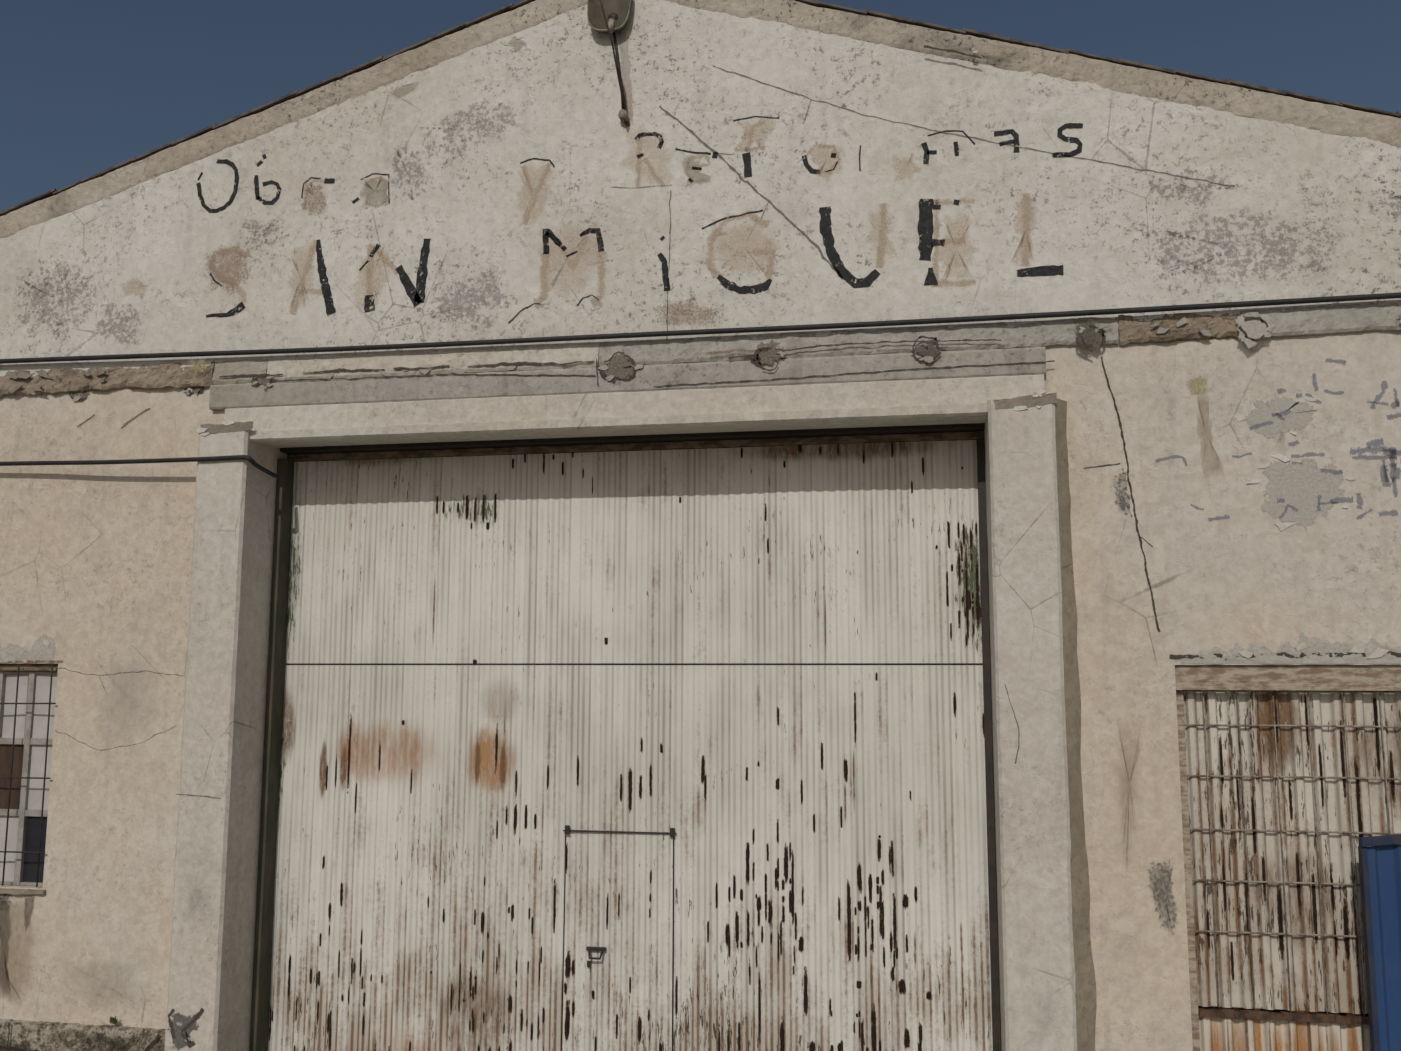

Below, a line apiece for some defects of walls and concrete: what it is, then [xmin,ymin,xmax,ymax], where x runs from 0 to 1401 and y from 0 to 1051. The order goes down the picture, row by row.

flaking render [0,361,215,402]
crack [1083,356,1401,660]
flaking render [0,634,55,663]
crack [57,668,183,692]
flaking render [1176,632,1401,664]
crack [55,726,175,751]
corrosion [1259,690,1324,822]
corrosion [1340,692,1401,837]
corrosion [1219,738,1350,962]
damp [0,893,33,988]
corrosion [1206,859,1227,949]
corrosion [1211,1011,1328,1051]